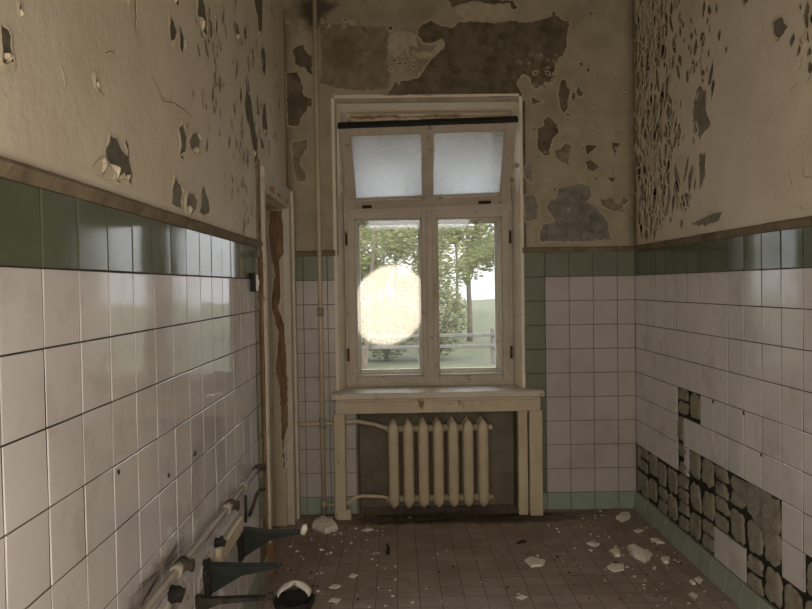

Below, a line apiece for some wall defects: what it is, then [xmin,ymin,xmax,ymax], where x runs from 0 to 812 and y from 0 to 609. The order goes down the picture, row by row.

peeling [0,20,17,74]
peeling [93,130,133,188]
peeling [168,0,585,236]
peeling [523,0,729,244]
peeling [771,0,812,75]
peeling [637,387,812,609]